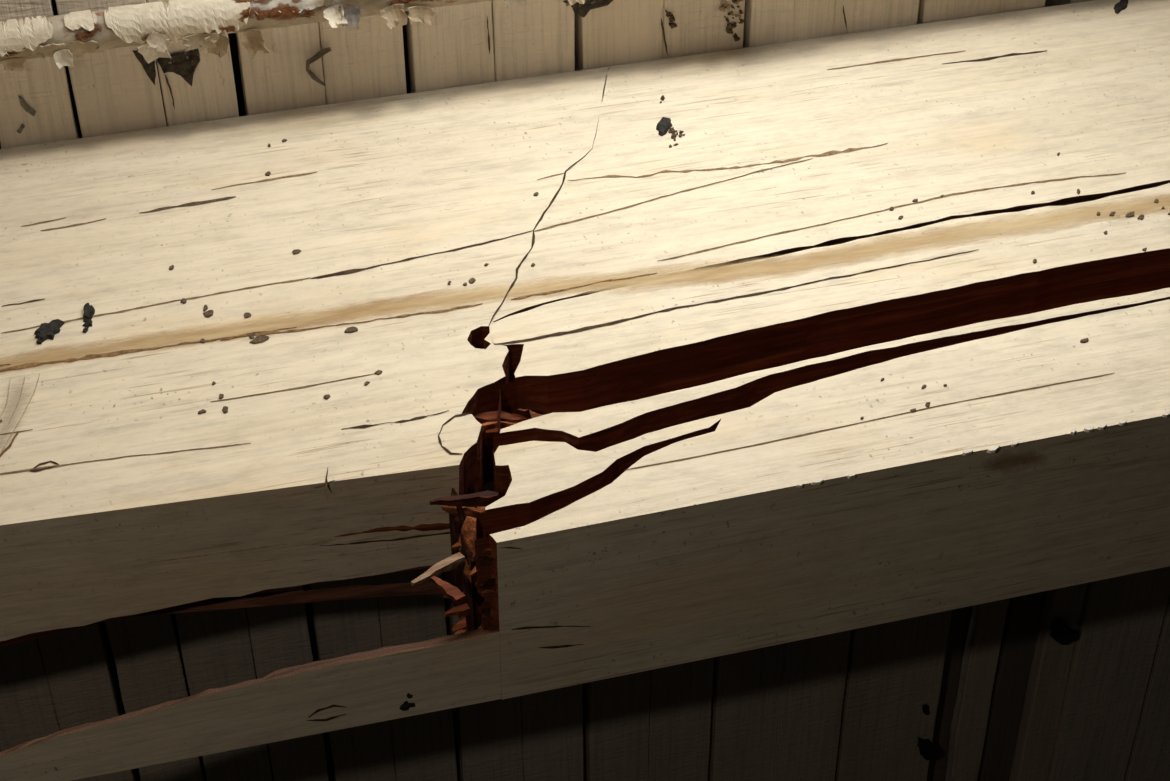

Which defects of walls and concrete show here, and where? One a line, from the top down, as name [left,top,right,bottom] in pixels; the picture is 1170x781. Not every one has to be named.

rust [75,23,102,41]
rust [218,0,315,32]
peeling [323,4,364,29]
peeling [380,4,436,30]
peeling [563,0,613,17]
peeling [132,29,270,109]
crack [659,173,1170,268]
crack [2,143,979,345]
leakage [0,196,1170,372]
crack [210,373,375,402]
crack [0,443,250,475]
crack [321,250,1170,649]